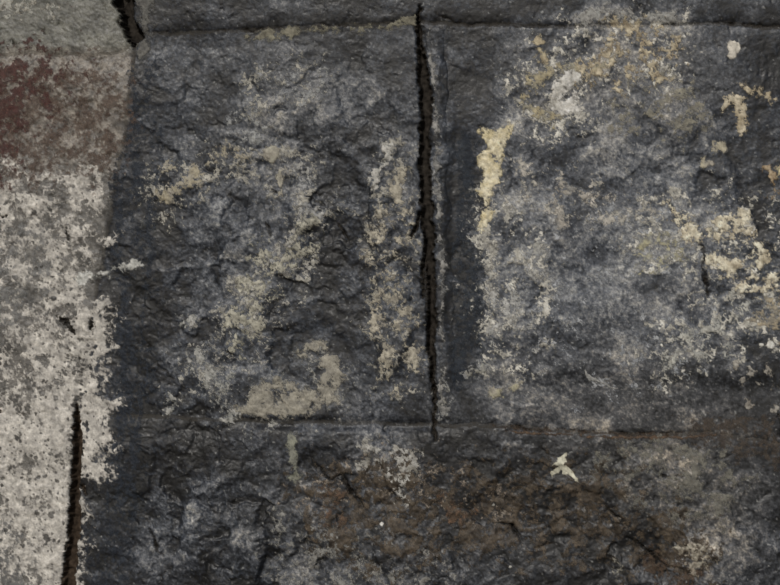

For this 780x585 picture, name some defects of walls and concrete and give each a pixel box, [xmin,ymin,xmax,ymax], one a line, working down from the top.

crack [410,5,438,442]
crack [61,404,87,585]